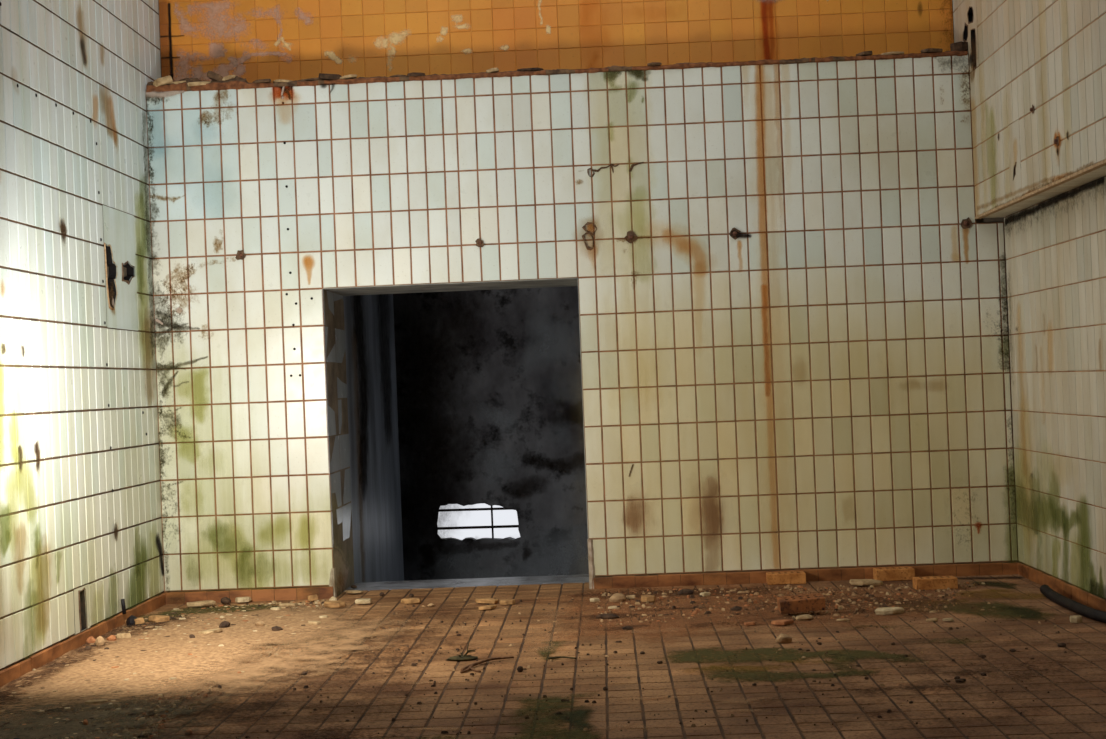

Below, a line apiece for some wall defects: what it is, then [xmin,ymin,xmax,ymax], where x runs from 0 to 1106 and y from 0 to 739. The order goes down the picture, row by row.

spalling [146,0,979,92]
rust [761,0,772,60]
spalling [103,243,135,310]
water stain [142,97,207,537]
water stain [998,255,1013,370]